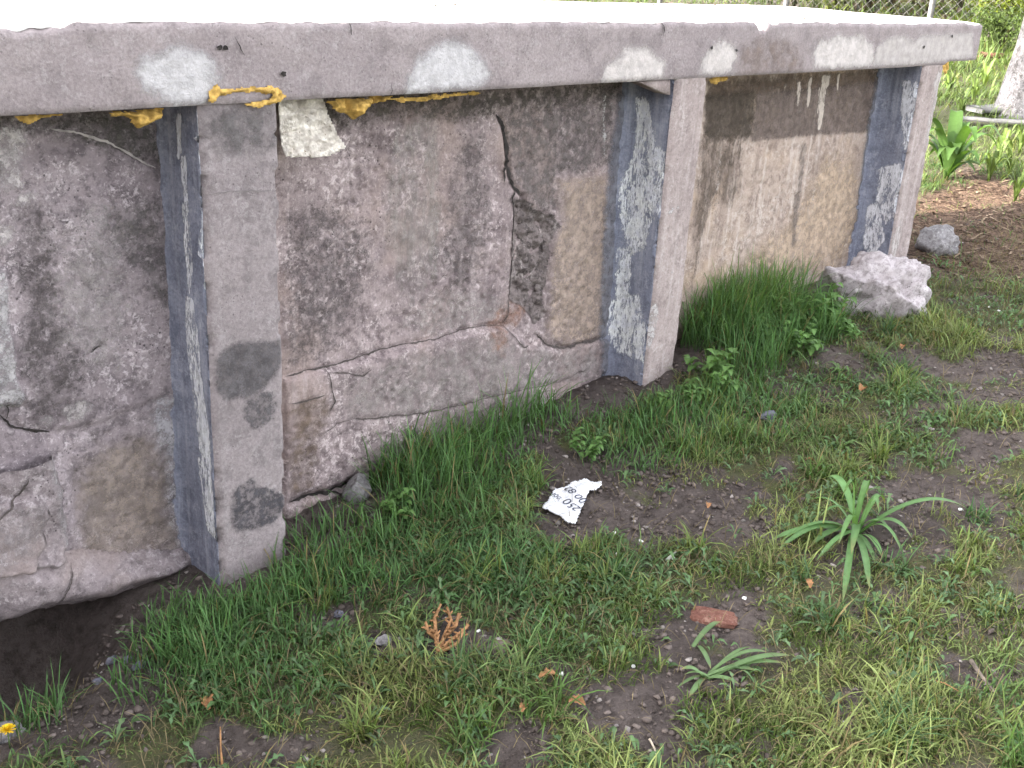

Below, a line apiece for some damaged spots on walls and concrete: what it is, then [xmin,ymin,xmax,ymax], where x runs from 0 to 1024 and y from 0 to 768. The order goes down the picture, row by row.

crack [496,114,520,210]
damp [695,34,973,270]
flaking render [509,178,608,341]
damp [607,96,679,363]
crack [0,480,29,520]
crack [0,403,49,433]
damp [233,401,328,530]
crack [288,301,600,431]